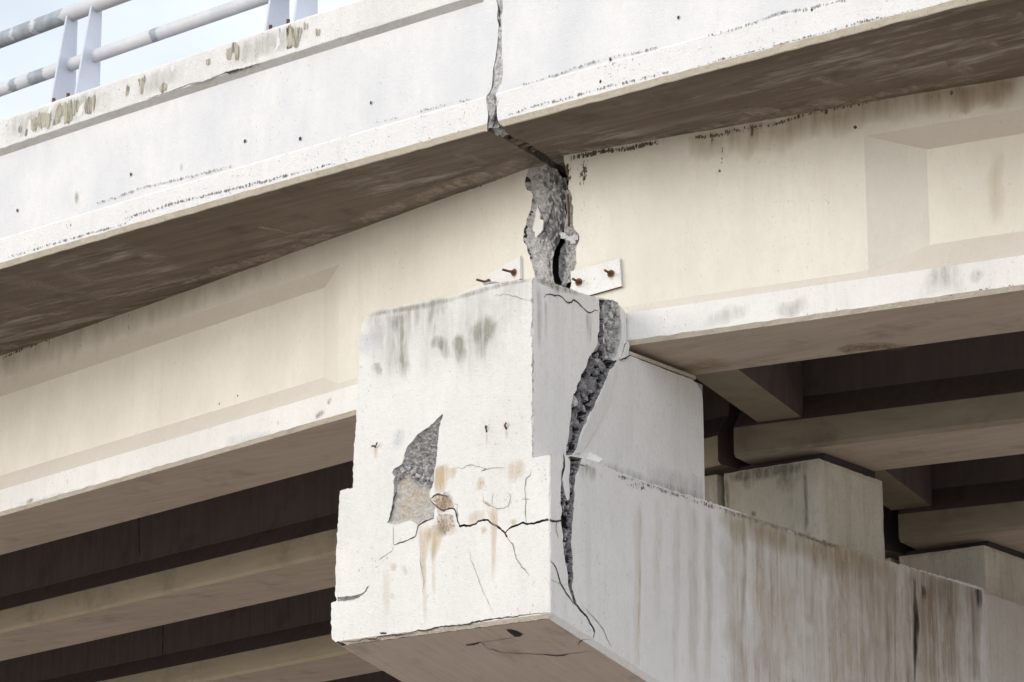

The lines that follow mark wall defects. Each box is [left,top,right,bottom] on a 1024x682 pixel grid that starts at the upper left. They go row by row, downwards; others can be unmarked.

crack [487,0,503,130]
damp [559,135,672,185]
damp [689,64,995,172]
spalling [523,164,579,285]
damp [379,302,434,366]
damp [440,337,463,357]
spalling [387,414,455,534]
crack [336,294,630,656]
damp [909,568,953,682]